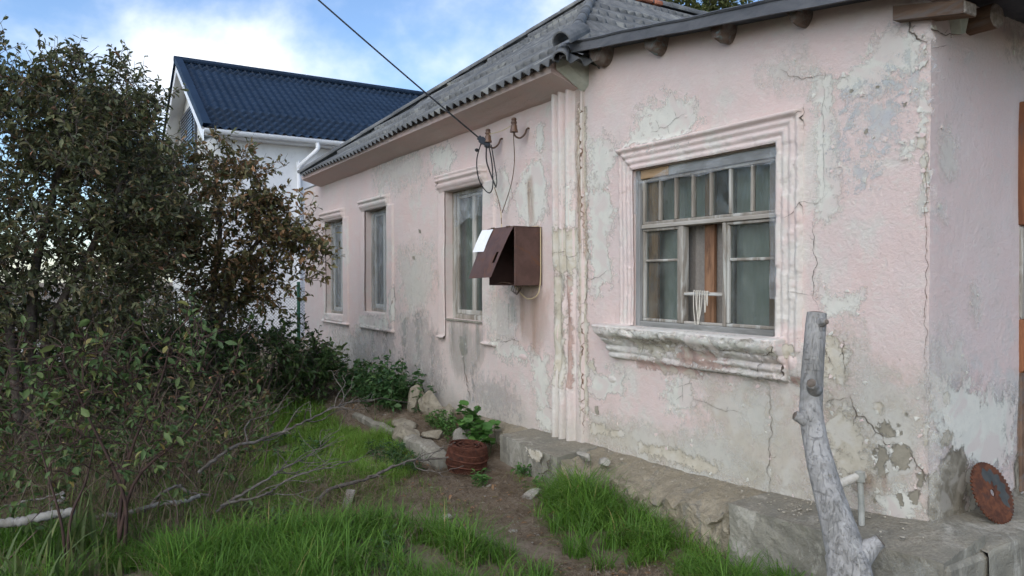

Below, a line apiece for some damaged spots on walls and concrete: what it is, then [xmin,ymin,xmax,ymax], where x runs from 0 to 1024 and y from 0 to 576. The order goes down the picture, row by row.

crack [908,22,955,48]
peeling [489,88,812,499]
crack [780,69,826,302]
spalling [808,25,1018,519]
crack [676,347,797,483]
damp [926,446,979,521]